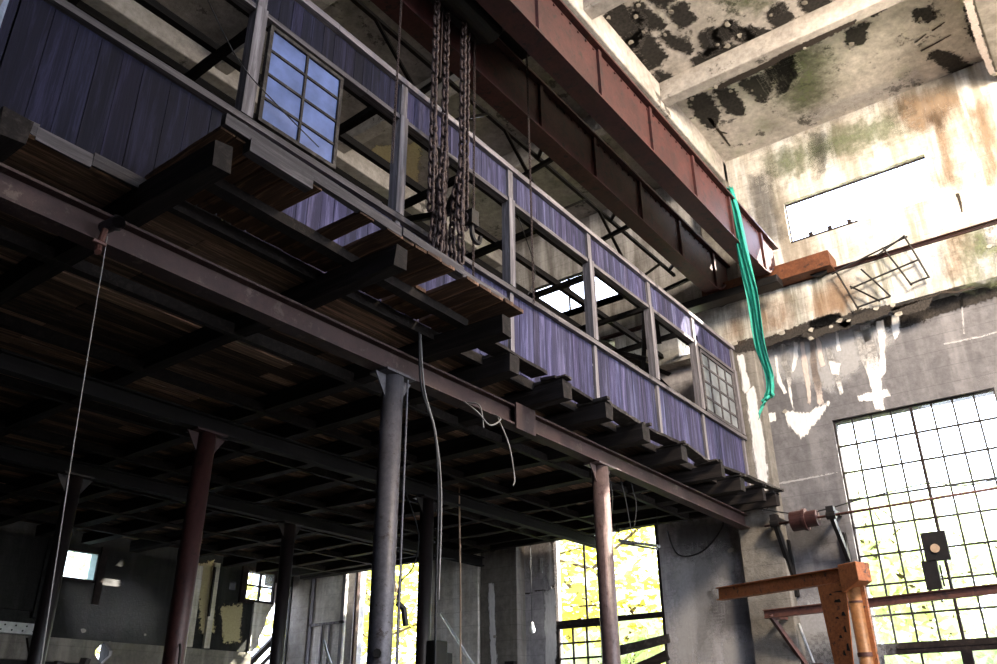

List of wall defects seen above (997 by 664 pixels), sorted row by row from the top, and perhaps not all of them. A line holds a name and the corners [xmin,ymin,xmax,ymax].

leakage [752,176,778,236]
peeling [769,401,830,439]